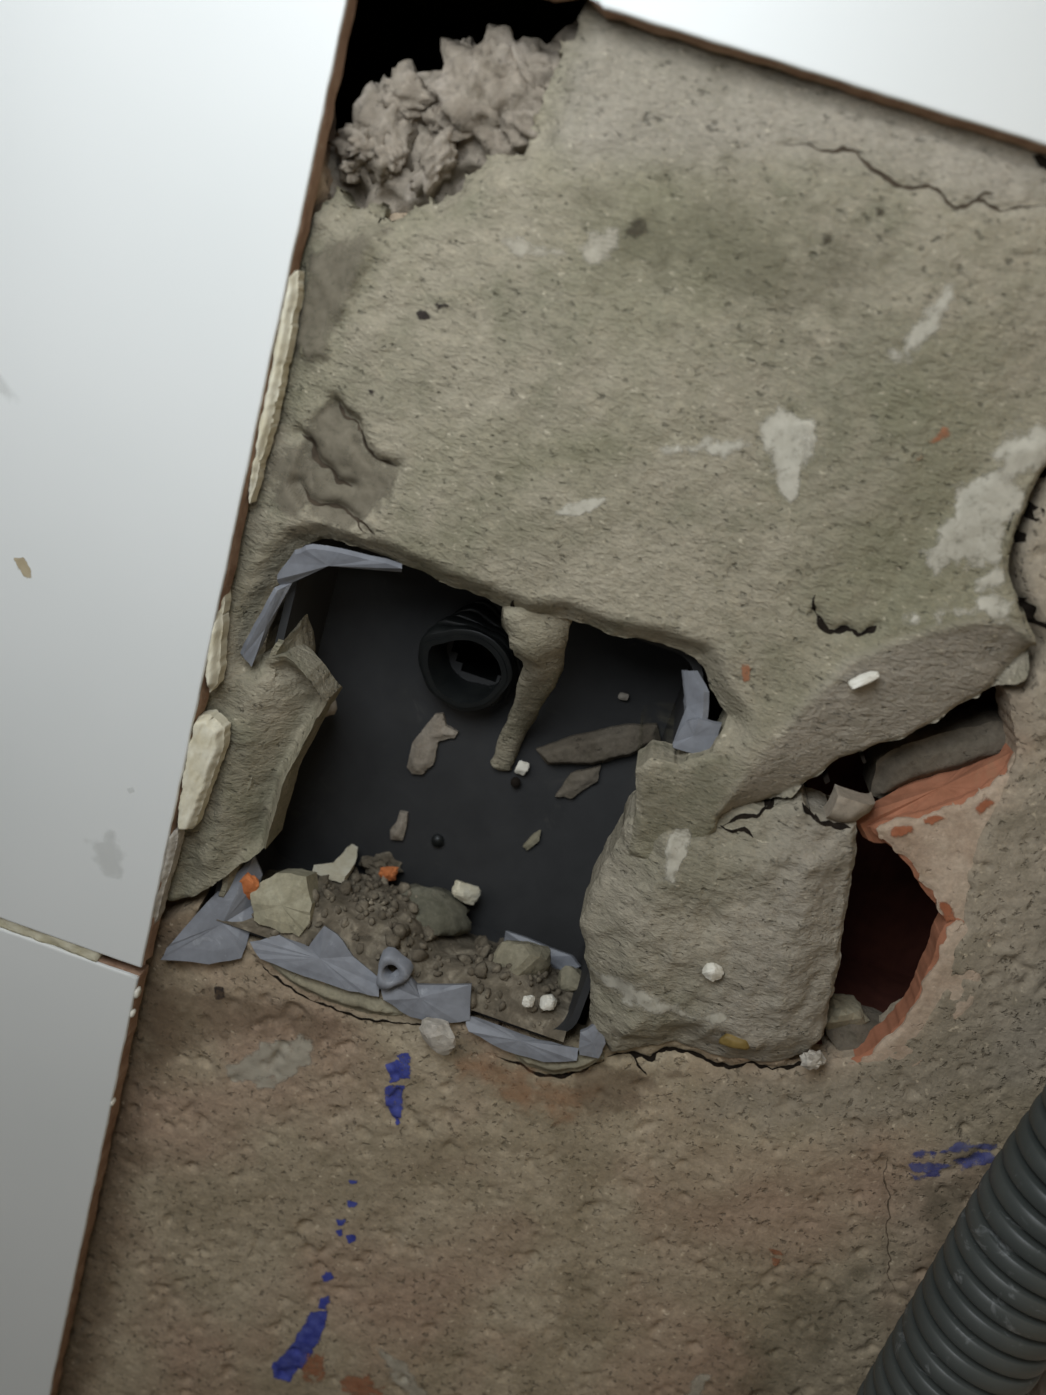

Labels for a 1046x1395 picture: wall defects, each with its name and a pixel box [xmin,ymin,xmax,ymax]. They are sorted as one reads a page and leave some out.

crack [785,143,1046,212]
crack [812,595,877,637]
peeling [848,671,880,689]
peeling [514,760,529,775]
spalling [239,872,259,900]
spalling [378,866,399,881]
peeling [452,880,481,905]
peeling [702,963,724,982]
crack [496,1047,802,1079]